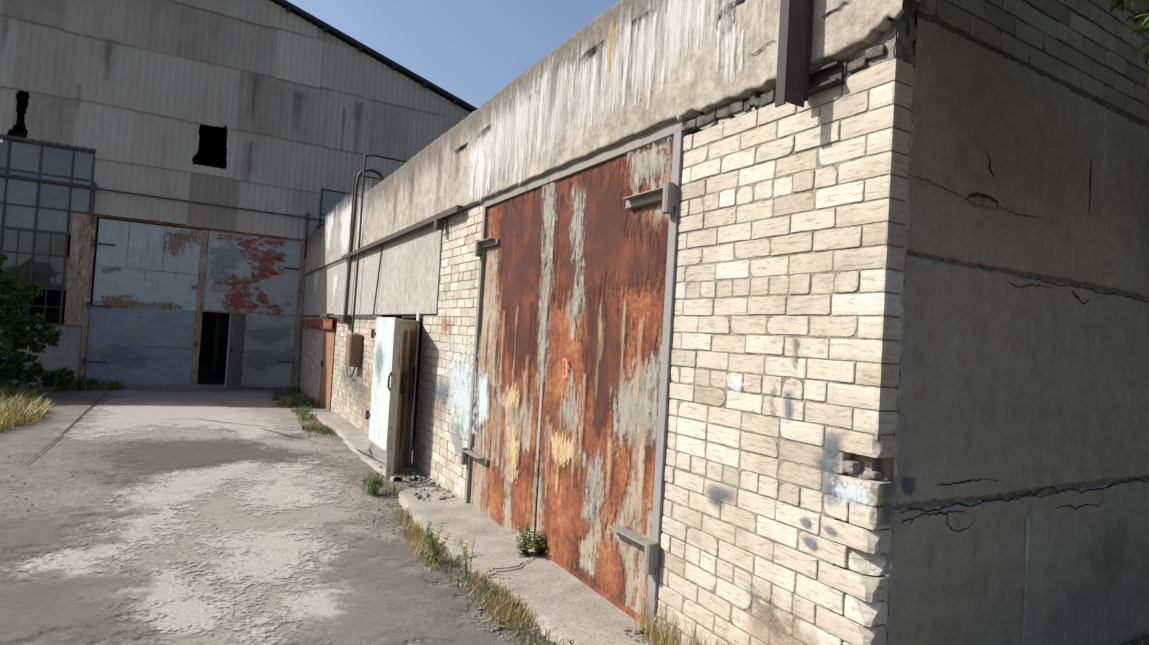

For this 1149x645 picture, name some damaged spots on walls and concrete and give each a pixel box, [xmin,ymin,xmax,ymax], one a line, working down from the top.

spalling [716,0,743,35]
leakage [469,0,743,199]
crack [1086,158,1094,213]
crack [1009,276,1149,304]
corrosion [476,136,674,613]
spalling [842,459,891,481]
crack [900,478,1149,532]